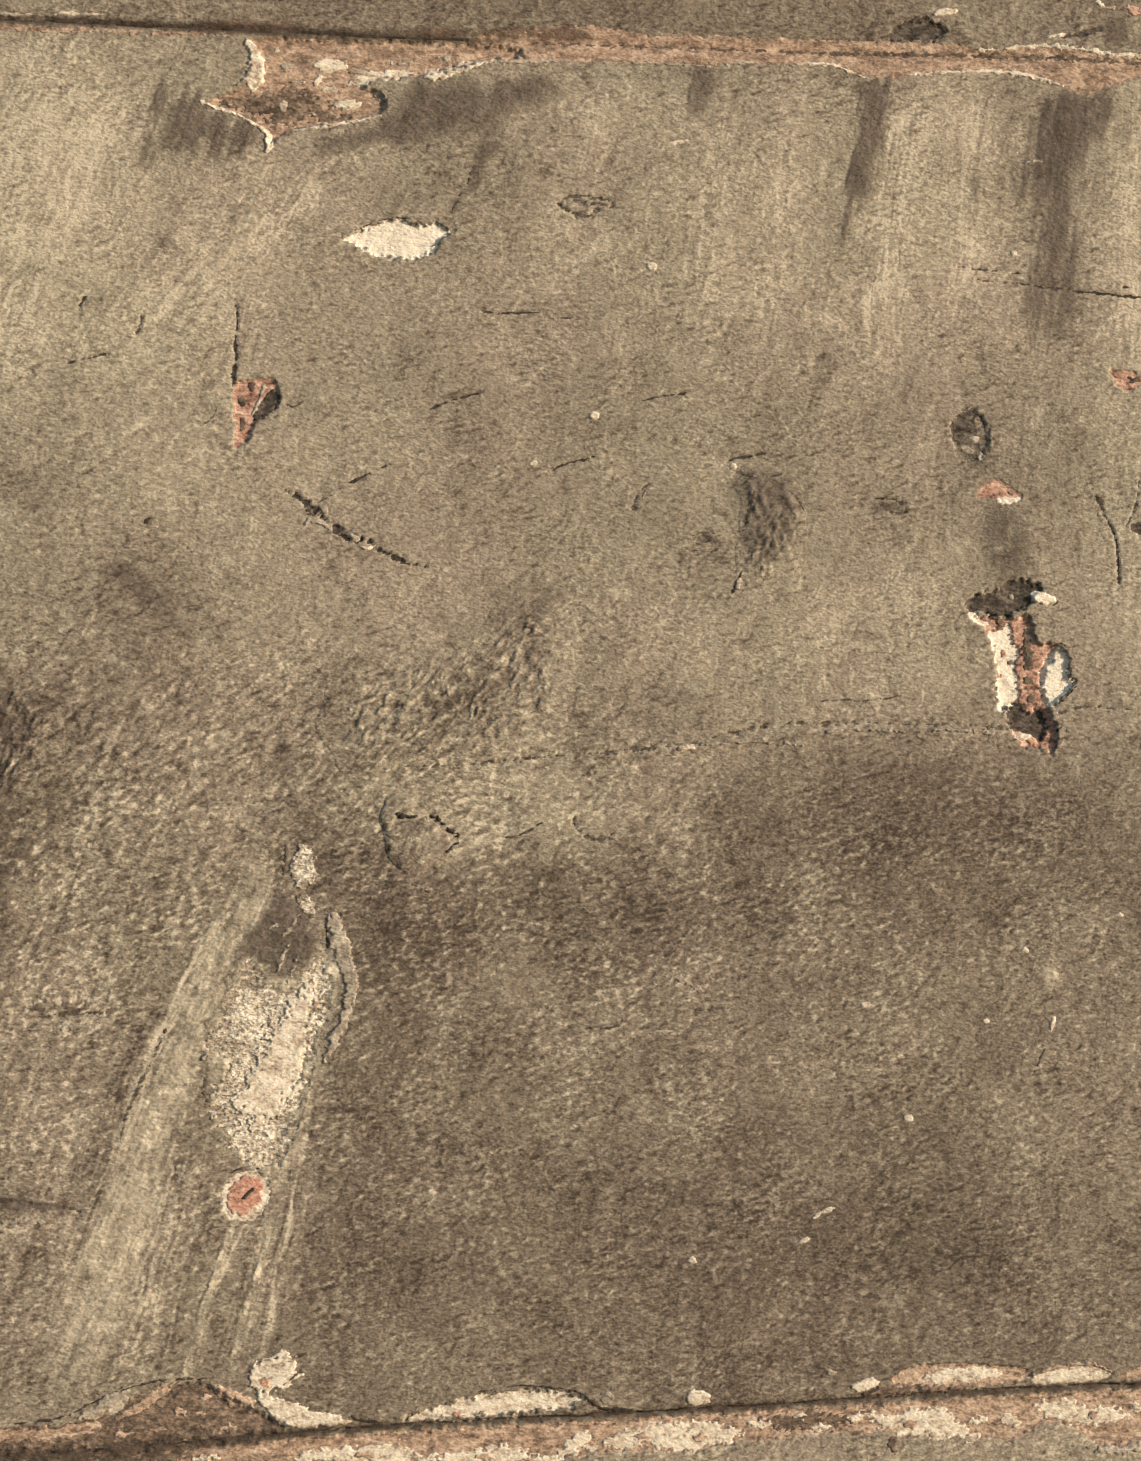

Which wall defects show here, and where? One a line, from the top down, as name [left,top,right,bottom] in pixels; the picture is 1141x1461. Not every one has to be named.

spalling [0,11,568,153]
leakage [1022,91,1112,326]
crack [958,266,1141,299]
crack [285,464,427,571]
crack [1089,480,1141,584]
spalling [964,578,1077,756]
crack [404,695,1008,768]
rust [220,1165,273,1222]
leakage [182,1225,234,1377]
leakage [243,1228,270,1315]
spalling [0,1346,382,1455]
spalling [403,1384,636,1424]